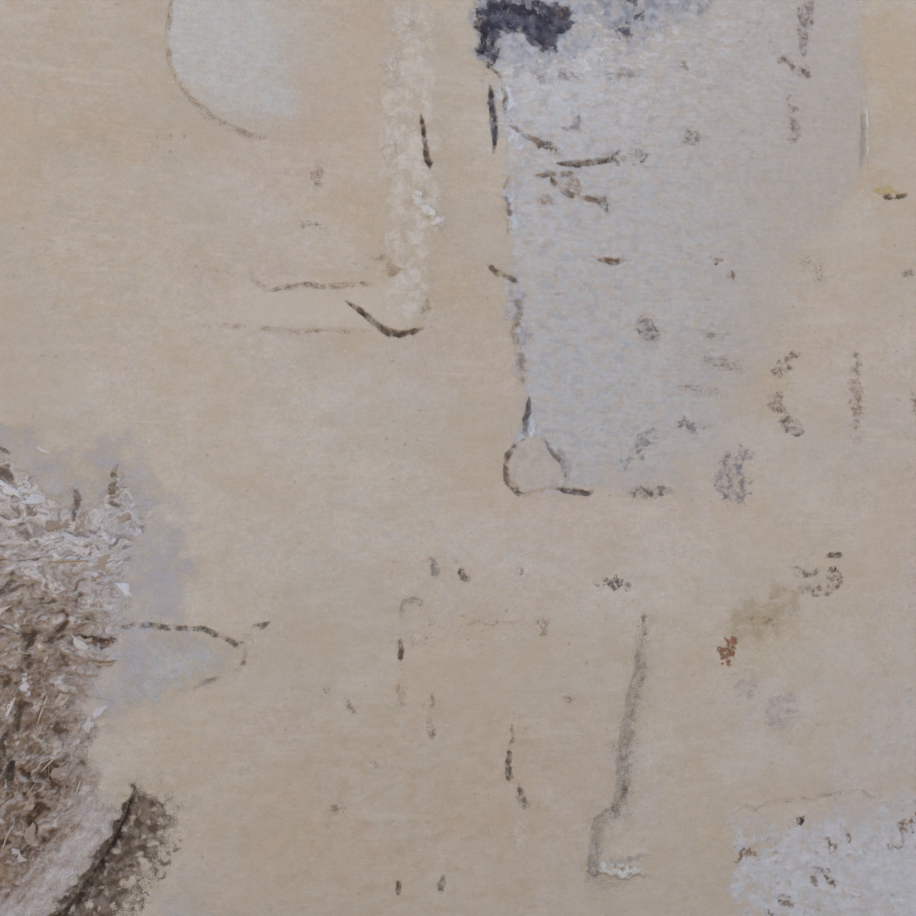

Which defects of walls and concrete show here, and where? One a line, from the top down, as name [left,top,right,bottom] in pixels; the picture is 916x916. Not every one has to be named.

crack [163,2,285,142]
crack [198,272,422,338]
damp [848,335,865,442]
spalling [0,455,148,916]
crack [112,621,271,691]
corrosion [717,633,742,666]
crack [575,609,662,896]
spalling [123,834,182,916]